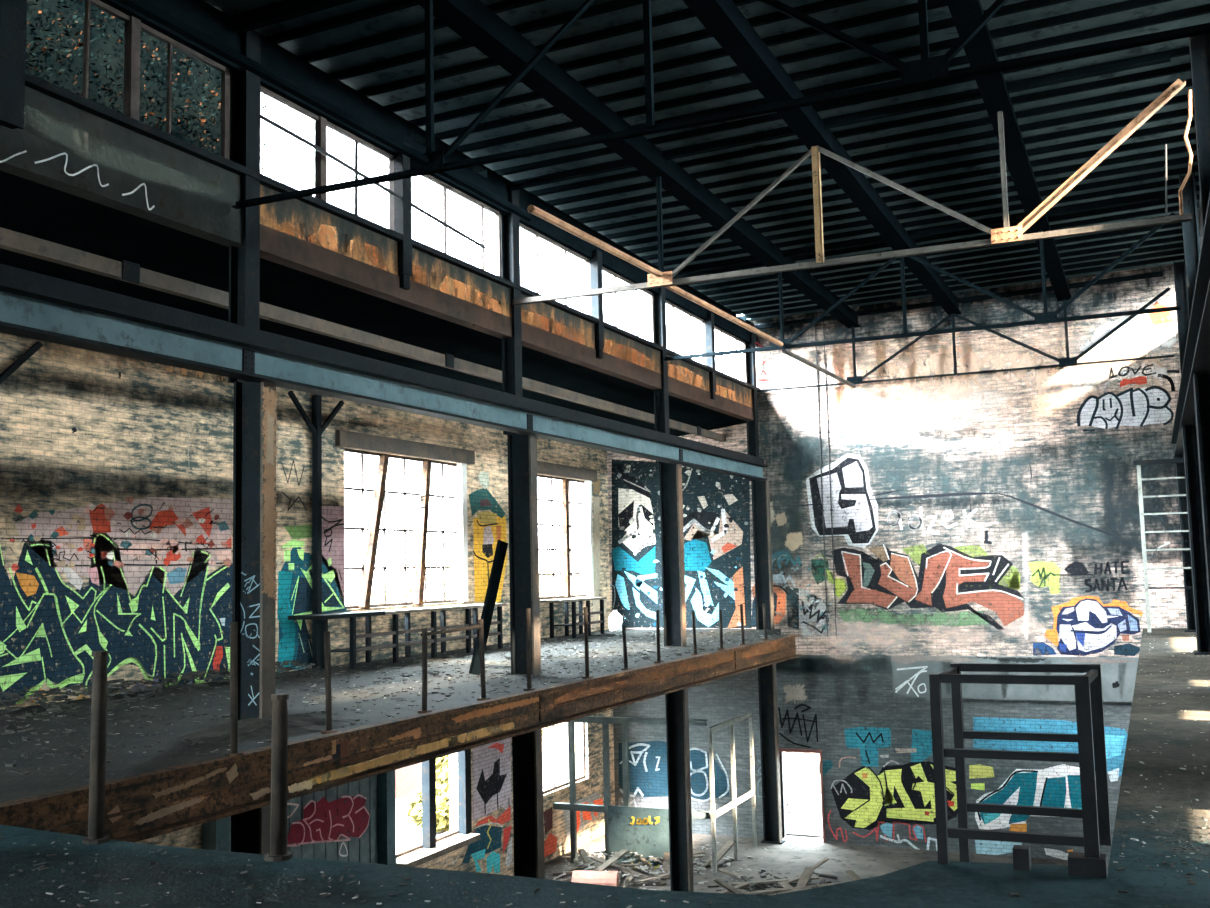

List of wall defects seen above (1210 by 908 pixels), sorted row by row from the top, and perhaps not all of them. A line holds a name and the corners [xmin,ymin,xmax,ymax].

rust [272,223,389,272]
rust [410,264,502,314]
rust [523,310,584,345]
rust [603,340,650,368]
rust [668,364,737,402]